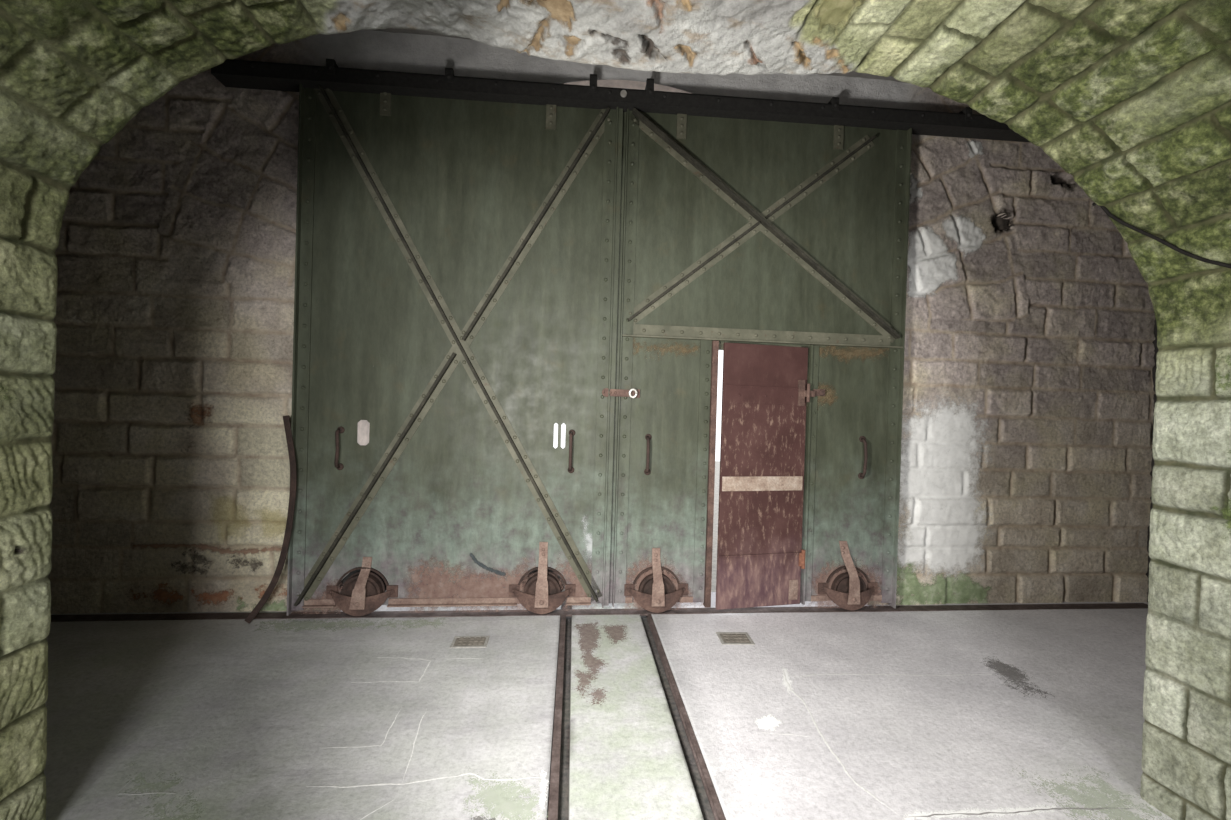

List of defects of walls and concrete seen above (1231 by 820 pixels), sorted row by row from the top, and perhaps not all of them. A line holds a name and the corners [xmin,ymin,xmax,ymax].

flaking render [497,0,697,67]
peeling [967,141,983,158]
peeling [907,209,1014,297]
rust [132,544,281,555]
rust [558,563,592,608]
water stain [896,563,991,605]
rust [574,622,631,705]
crack [771,668,1126,818]